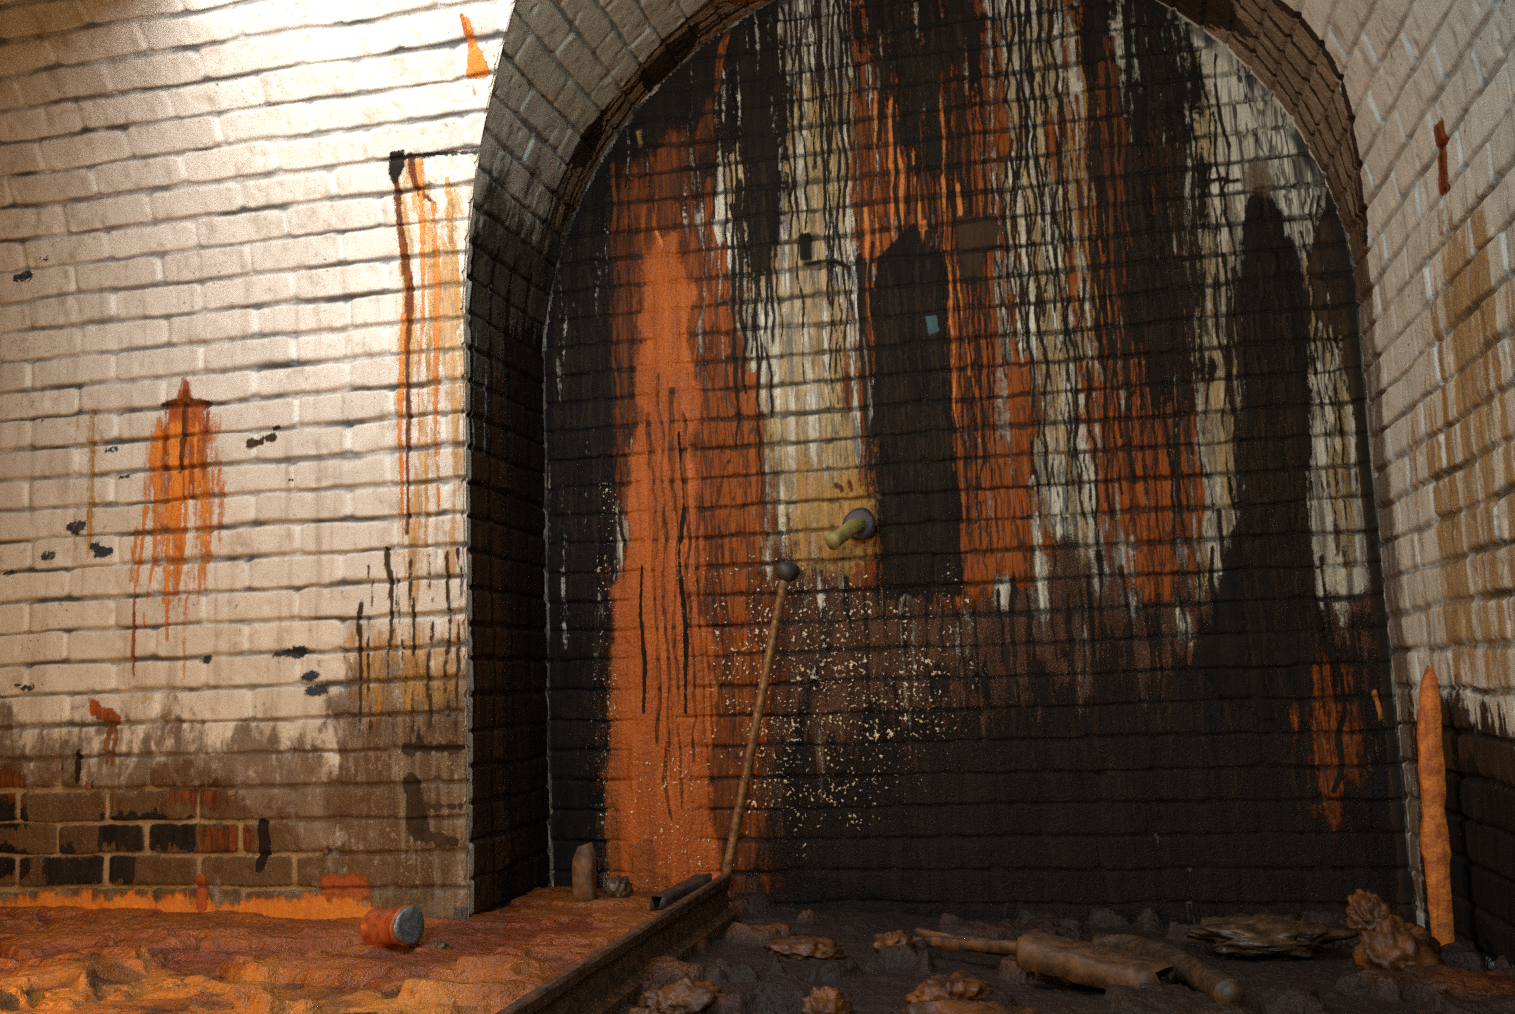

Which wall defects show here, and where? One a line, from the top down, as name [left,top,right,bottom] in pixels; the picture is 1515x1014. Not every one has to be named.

corrosion [459,13,491,94]
corrosion [77,409,97,557]
corrosion [89,698,120,764]
corrosion [129,378,226,676]
corrosion [388,149,480,601]
corrosion [596,0,1052,894]
leakage [272,0,1431,933]
corrosion [1042,0,1207,607]
corrosion [1290,147,1428,907]
corrosion [1409,118,1515,695]
leakage [1439,674,1515,970]